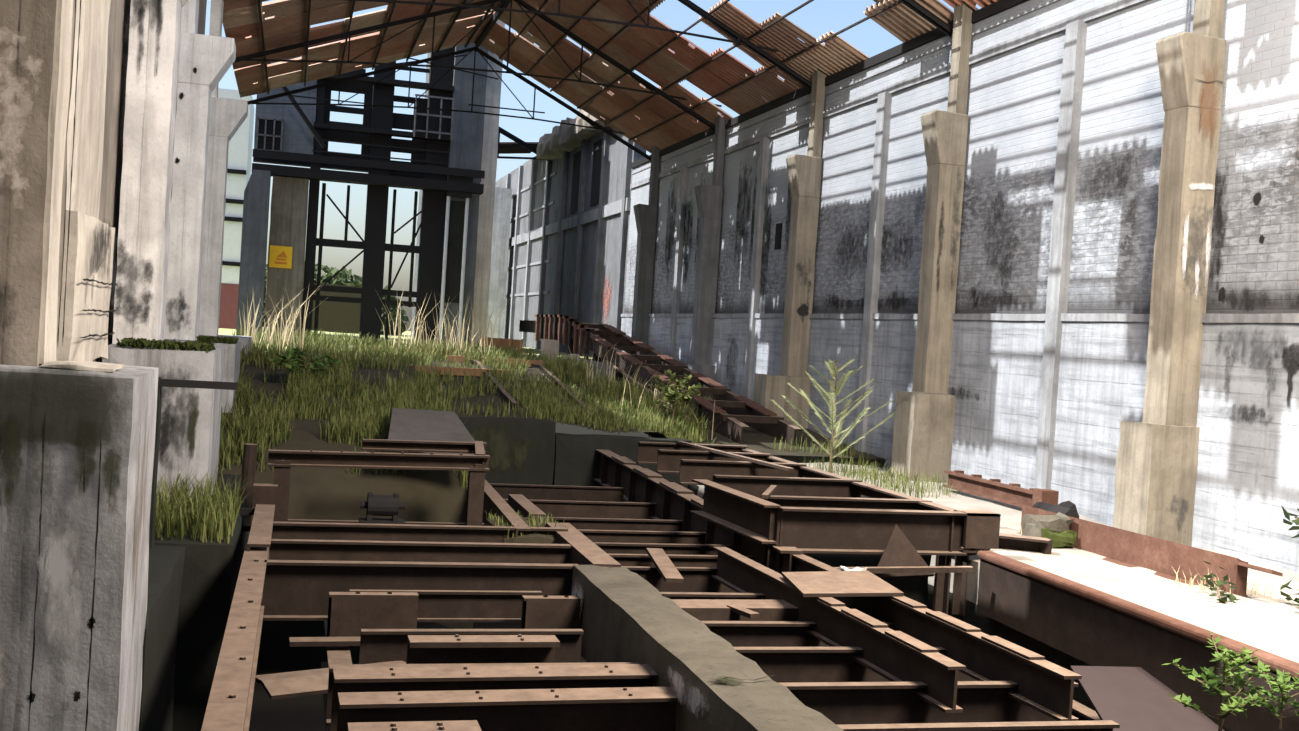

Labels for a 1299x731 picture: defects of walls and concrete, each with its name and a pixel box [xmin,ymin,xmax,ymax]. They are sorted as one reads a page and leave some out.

water stain [120,0,162,141]
water stain [93,224,153,320]
water stain [719,168,809,321]
water stain [829,289,908,309]
water stain [1208,173,1269,310]
water stain [1219,333,1299,407]
water stain [159,377,199,457]
water stain [0,419,50,503]
water stain [77,423,120,510]